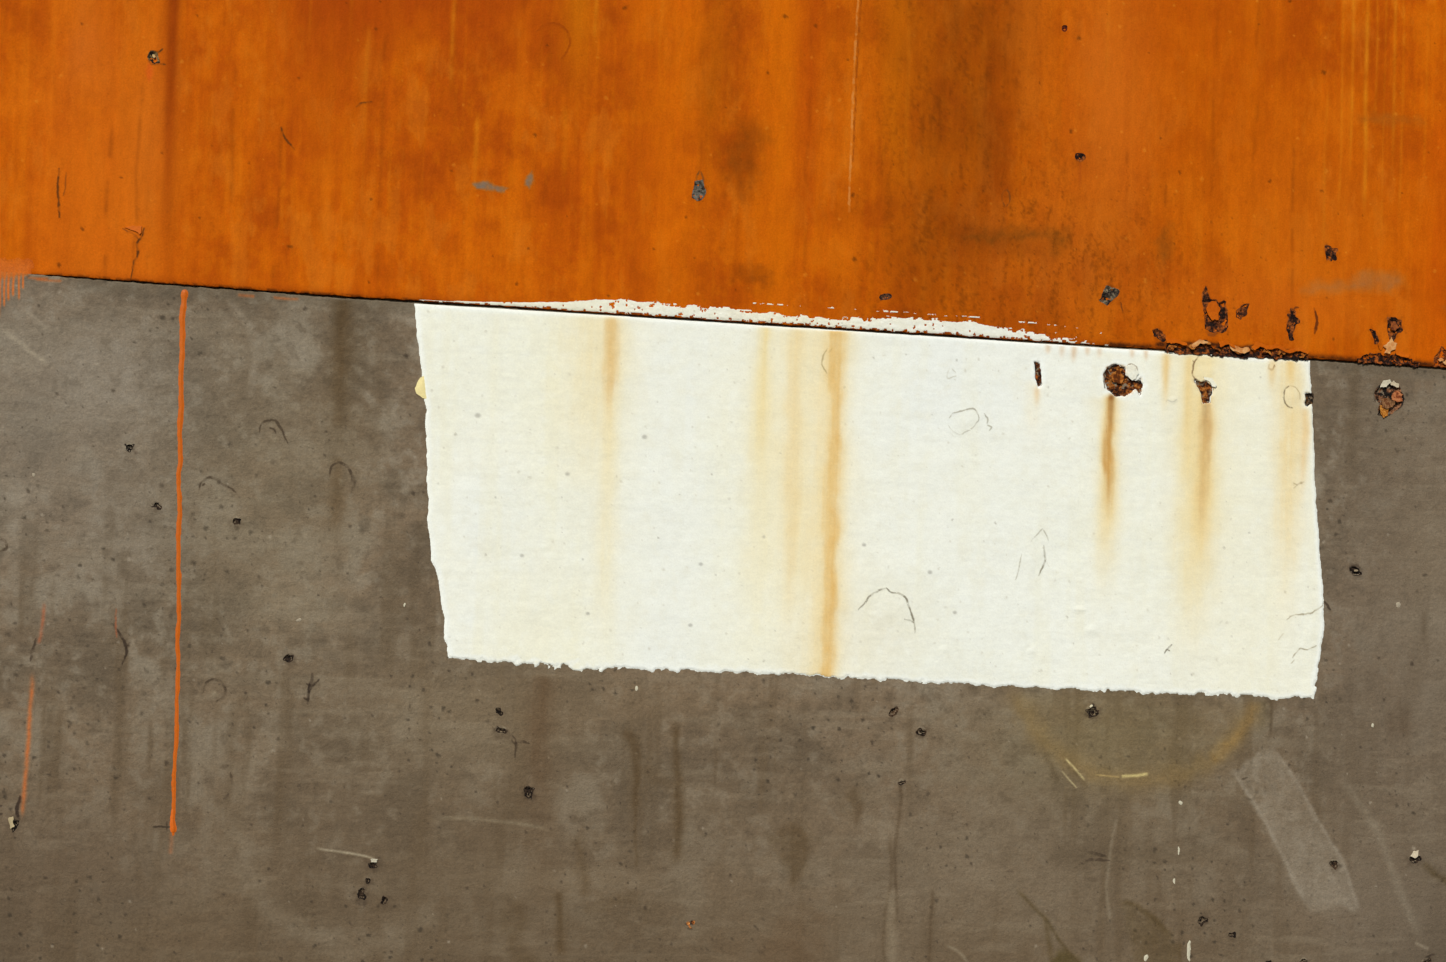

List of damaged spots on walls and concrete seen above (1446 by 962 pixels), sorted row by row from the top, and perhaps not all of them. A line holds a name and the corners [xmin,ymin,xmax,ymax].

rust [520,312,675,657]
rust [741,326,886,679]
rust [1016,377,1051,454]
rust [1042,344,1106,365]
rust [1080,350,1316,682]
peeling [1102,283,1446,418]